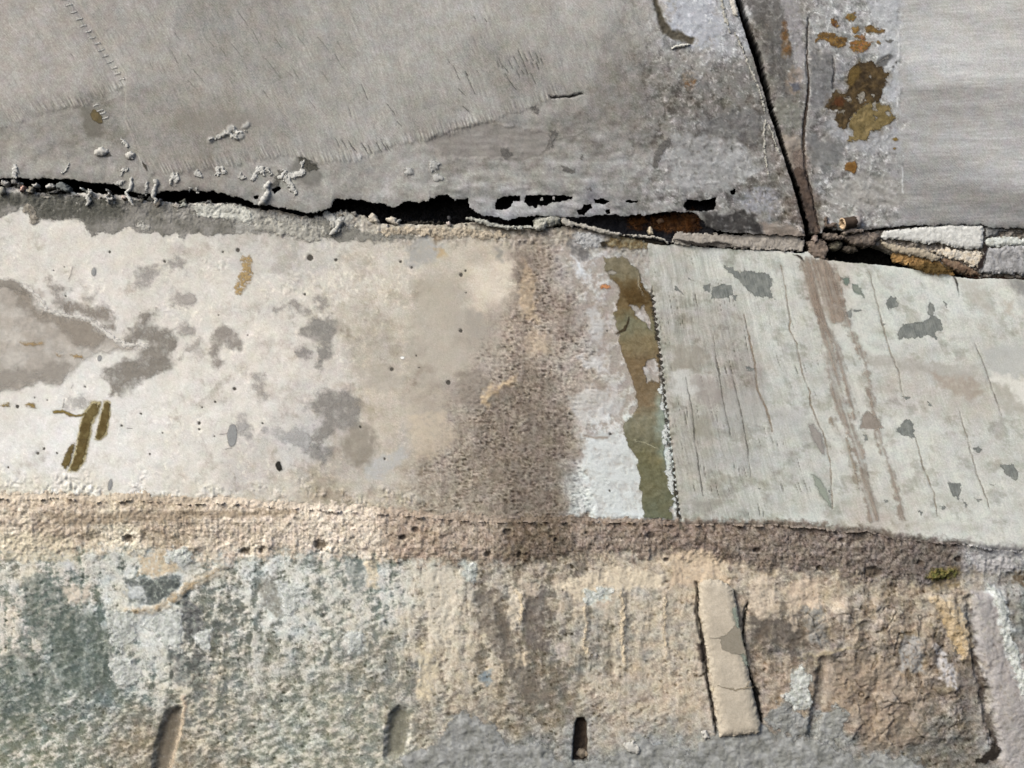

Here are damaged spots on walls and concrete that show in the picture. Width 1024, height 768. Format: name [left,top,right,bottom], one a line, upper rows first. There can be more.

corrosion [815,12,896,142]
spalling [90,109,102,123]
spalling [327,0,837,252]
crack [0,177,336,219]
peeling [298,157,319,171]
crack [497,195,579,229]
water stain [575,232,605,249]
crack [627,0,916,507]
corrosion [845,161,857,174]
water stain [273,300,335,367]
water stain [0,279,199,472]
crack [696,582,763,731]